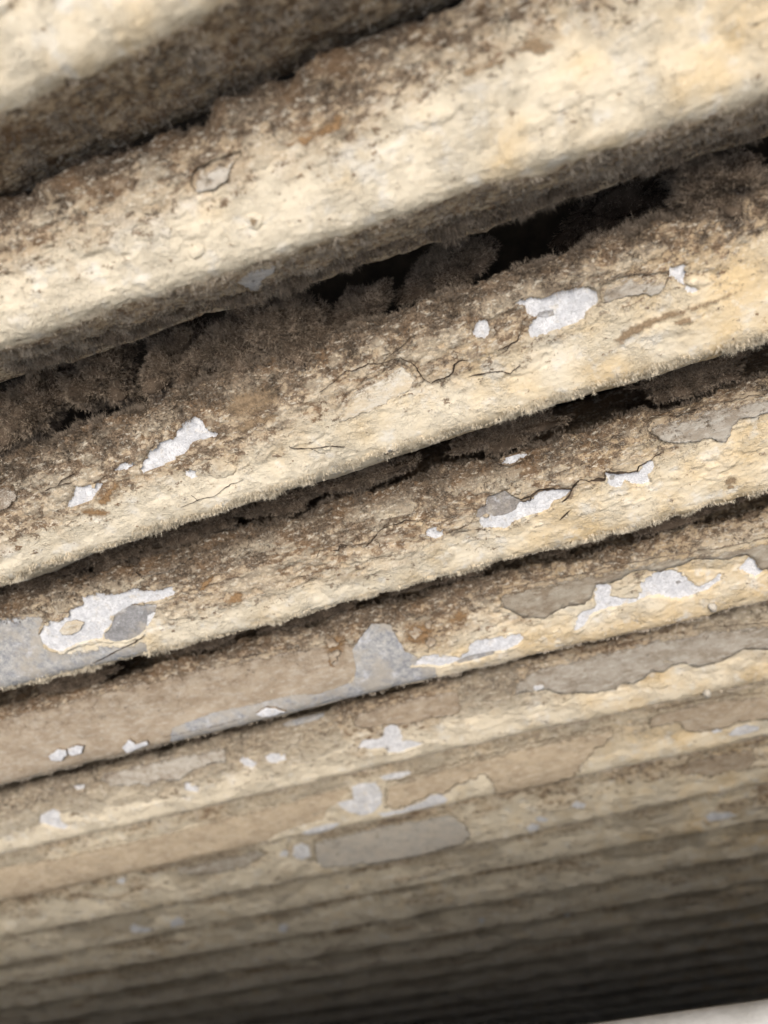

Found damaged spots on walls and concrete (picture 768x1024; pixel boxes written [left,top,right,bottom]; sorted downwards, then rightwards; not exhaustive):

peeling [514,287,598,338]
crack [320,322,523,392]
peeling [115,416,218,473]
peeling [605,460,654,487]
peeling [476,489,570,530]
peeling [739,556,762,577]
peeling [40,586,176,652]
peeling [573,569,721,630]
peeling [164,624,525,742]